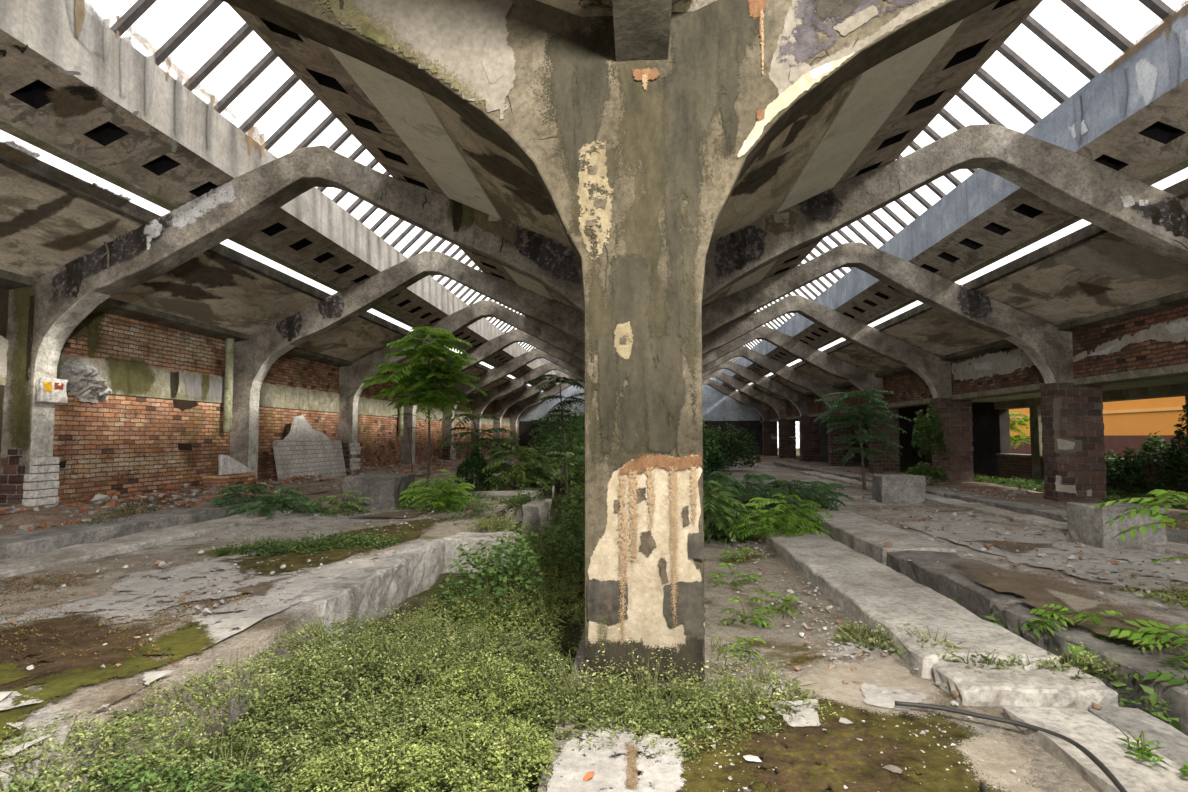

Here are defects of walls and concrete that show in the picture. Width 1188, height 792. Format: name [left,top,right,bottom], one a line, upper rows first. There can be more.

corrosion [747,0,766,75]
flaking render [737,0,946,157]
damp [457,116,556,217]
flaking render [577,139,614,260]
damp [513,0,844,477]
damp [0,288,35,460]
flaking render [614,322,634,359]
flaking render [1073,315,1188,362]
spalling [587,454,706,676]
corrosion [617,452,703,647]